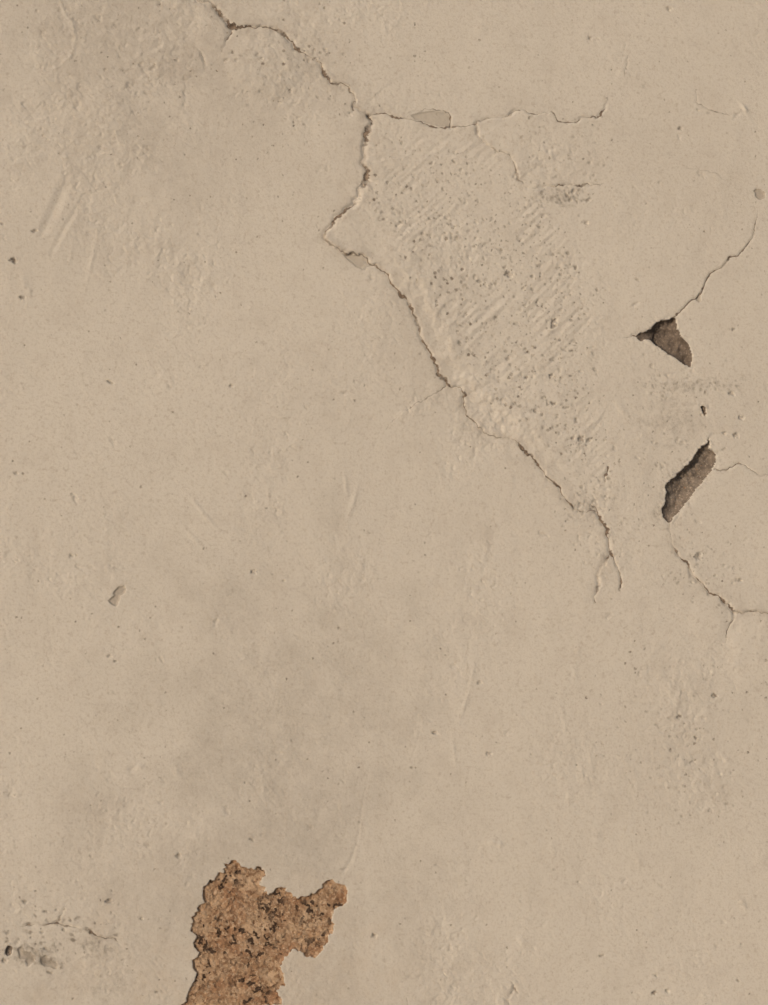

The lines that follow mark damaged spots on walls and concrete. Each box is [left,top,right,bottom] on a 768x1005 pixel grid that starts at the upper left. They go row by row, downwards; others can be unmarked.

crack [325,207,351,232]
crack [215,7,483,142]
crack [362,166,370,181]
crack [363,256,491,436]
peeling [324,110,612,512]
crack [525,110,603,123]
crack [675,221,756,316]
crack [519,444,622,588]
crack [675,550,762,634]
spalling [181,860,348,1005]